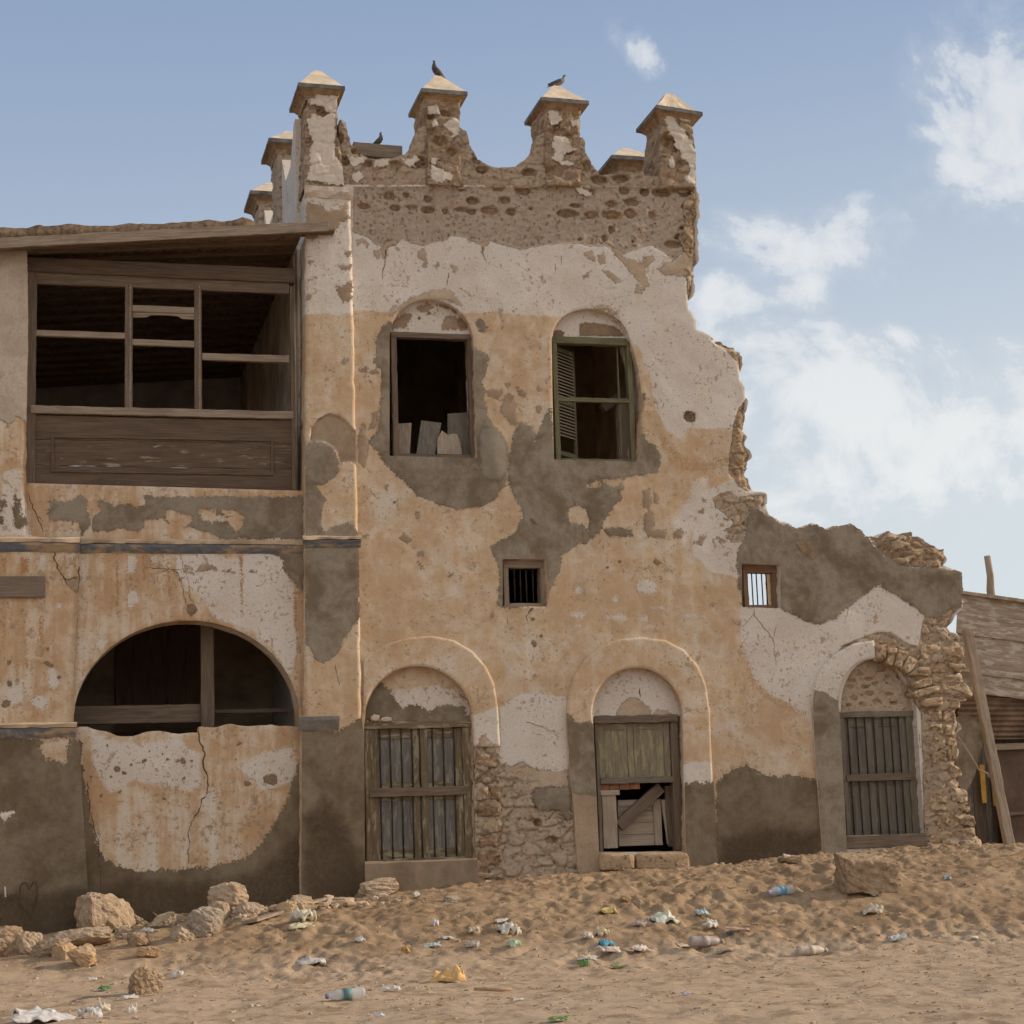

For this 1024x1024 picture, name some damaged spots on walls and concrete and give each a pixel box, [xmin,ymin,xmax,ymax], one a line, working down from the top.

spalling [305,94,697,303]
spalling [715,343,740,371]
spalling [308,410,379,469]
peeling [45,495,91,536]
crack [53,552,80,593]
crack [149,556,194,603]
spalling [870,533,944,568]
spalling [839,609,979,846]
crack [188,730,209,864]
spalling [473,733,601,883]